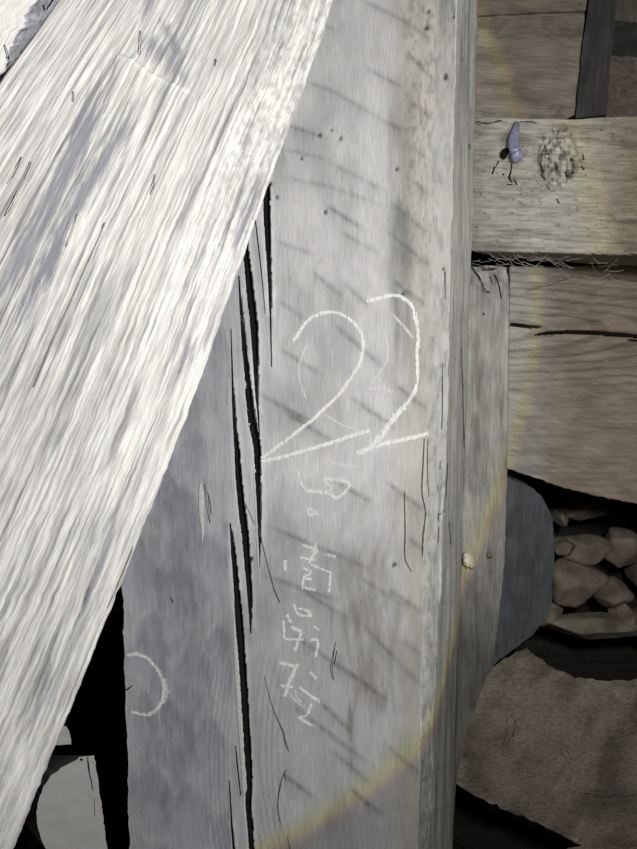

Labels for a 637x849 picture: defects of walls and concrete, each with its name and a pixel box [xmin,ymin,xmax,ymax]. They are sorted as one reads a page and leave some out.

crack [229,185,290,849]
crack [511,323,637,341]